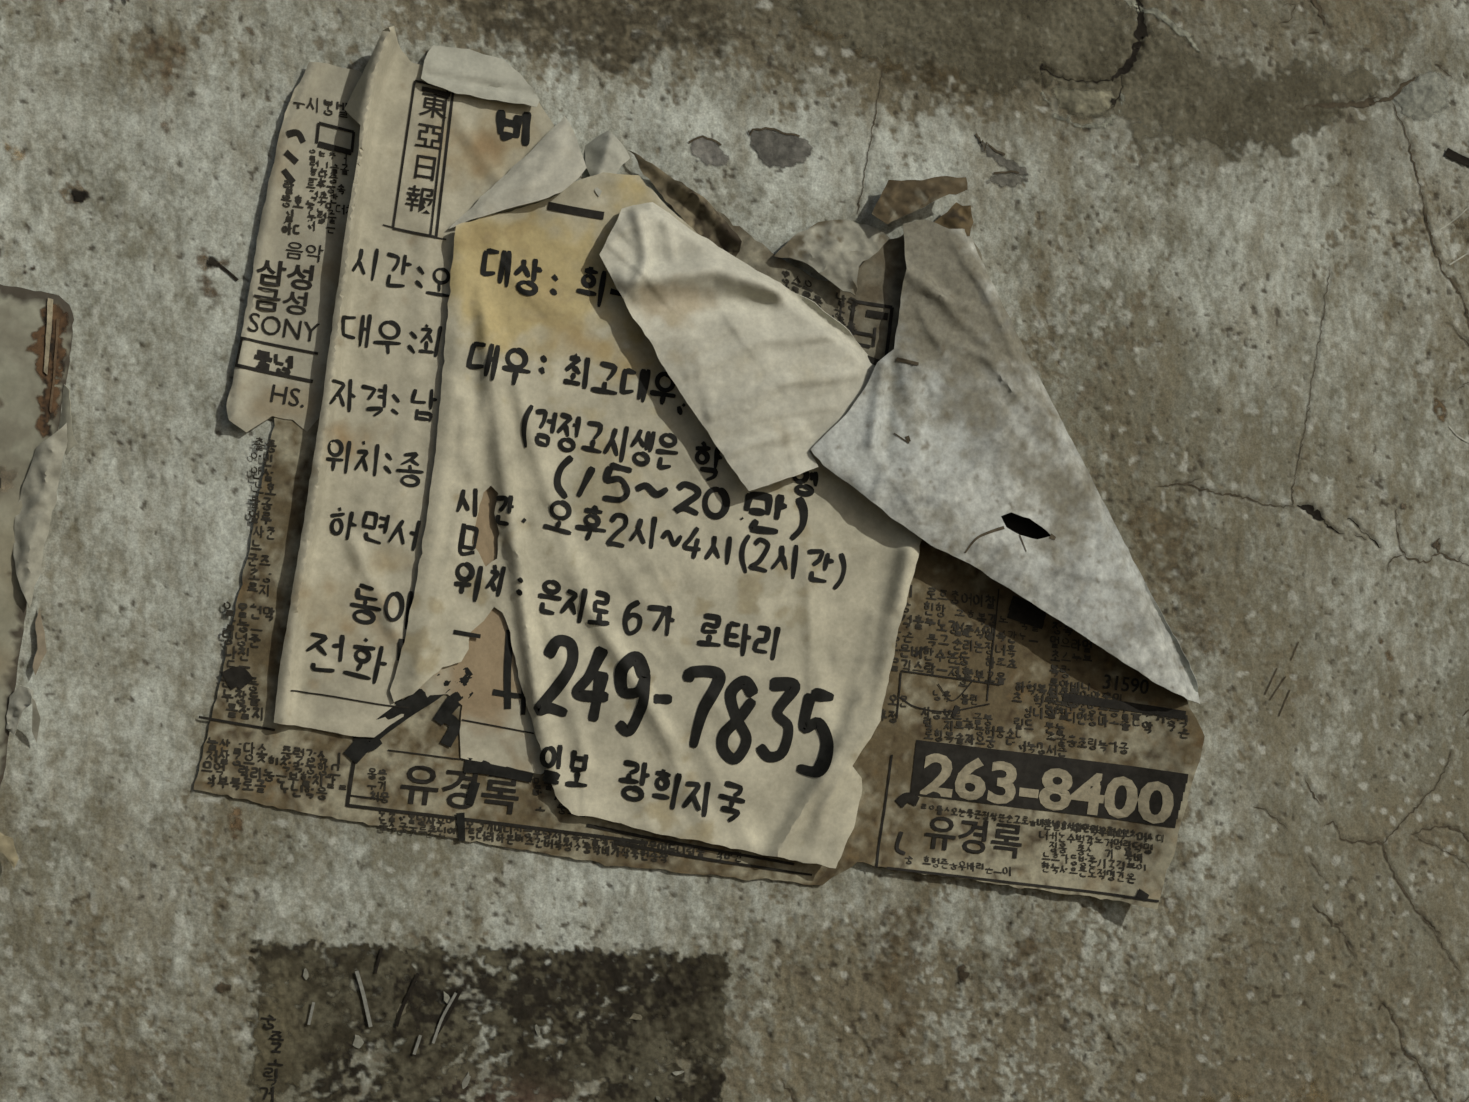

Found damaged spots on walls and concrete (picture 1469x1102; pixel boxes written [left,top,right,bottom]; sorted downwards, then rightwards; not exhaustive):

crack [1040,0,1148,111]
crack [1296,64,1469,346]
crack [1157,479,1293,508]
crack [1387,509,1469,571]
crack [1255,807,1355,958]
crack [1305,749,1469,974]
crack [1379,1003,1440,1102]